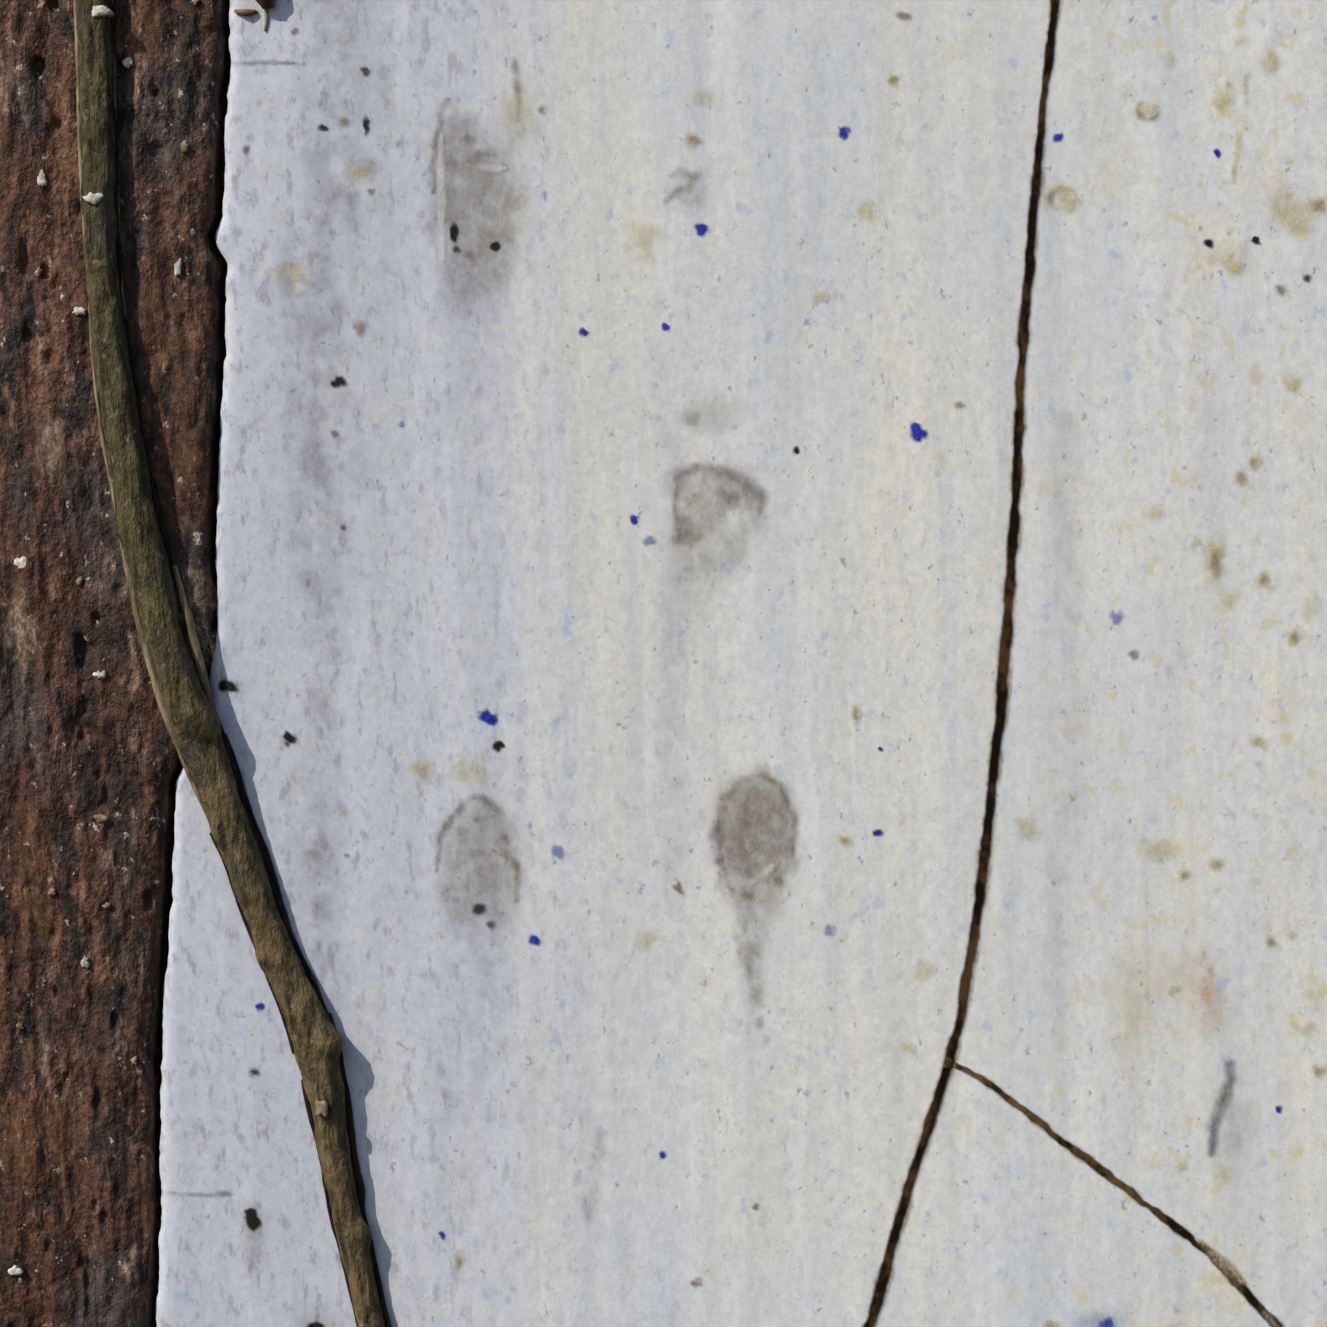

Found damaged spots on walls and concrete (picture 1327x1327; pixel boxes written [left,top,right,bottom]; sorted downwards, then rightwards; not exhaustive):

leakage [439,137,513,272]
crack [863,0,1283,1327]
leakage [473,904,493,927]